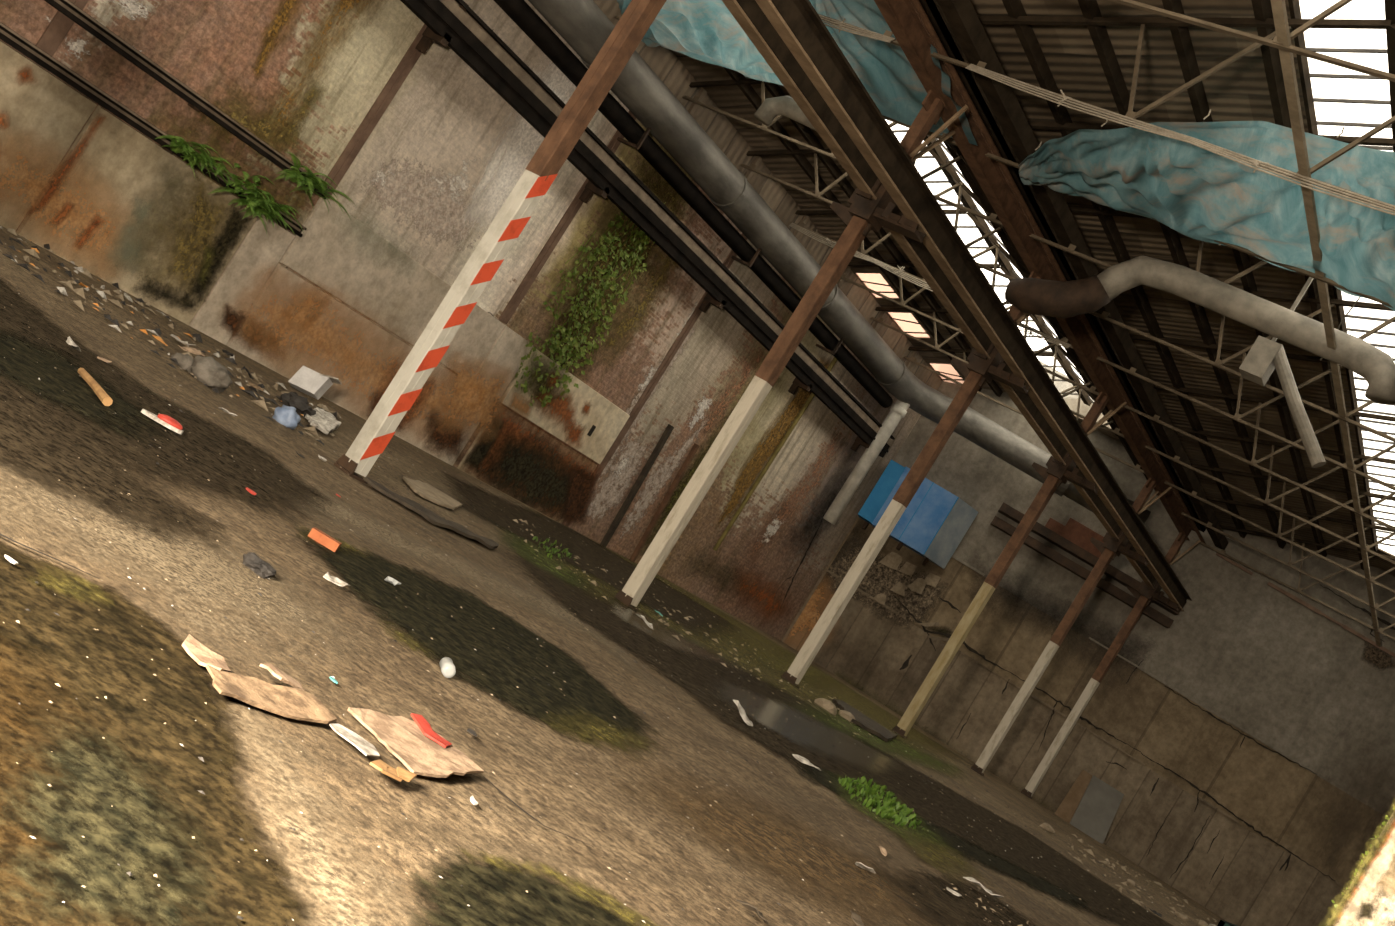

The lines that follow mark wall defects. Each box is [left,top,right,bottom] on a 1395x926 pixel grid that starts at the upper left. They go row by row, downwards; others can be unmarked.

rust [19,70,30,83]
peeling [113,0,155,20]
water stain [212,0,372,150]
rust [0,117,116,261]
rust [248,295,400,401]
water stain [0,279,659,750]
rust [403,365,590,445]
peeling [585,301,716,538]
water stain [719,388,812,523]
spalling [826,547,953,642]
crack [893,595,1335,884]